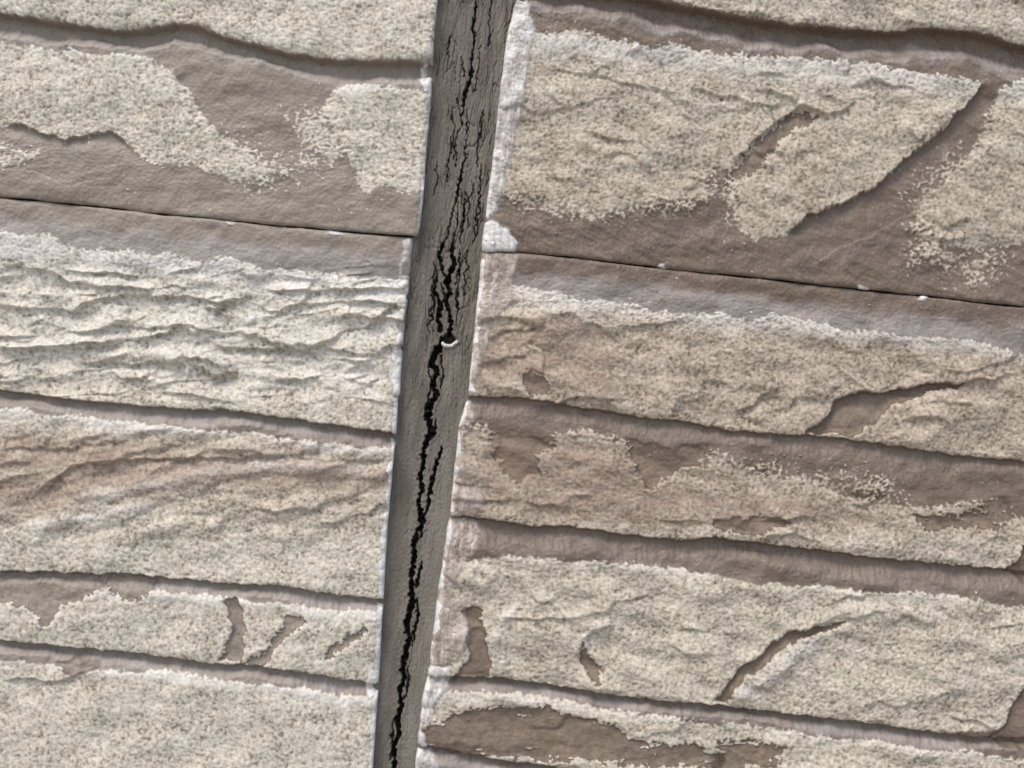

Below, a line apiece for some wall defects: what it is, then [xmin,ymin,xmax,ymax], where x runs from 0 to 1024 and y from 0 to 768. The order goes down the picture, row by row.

crack [390,0,493,768]